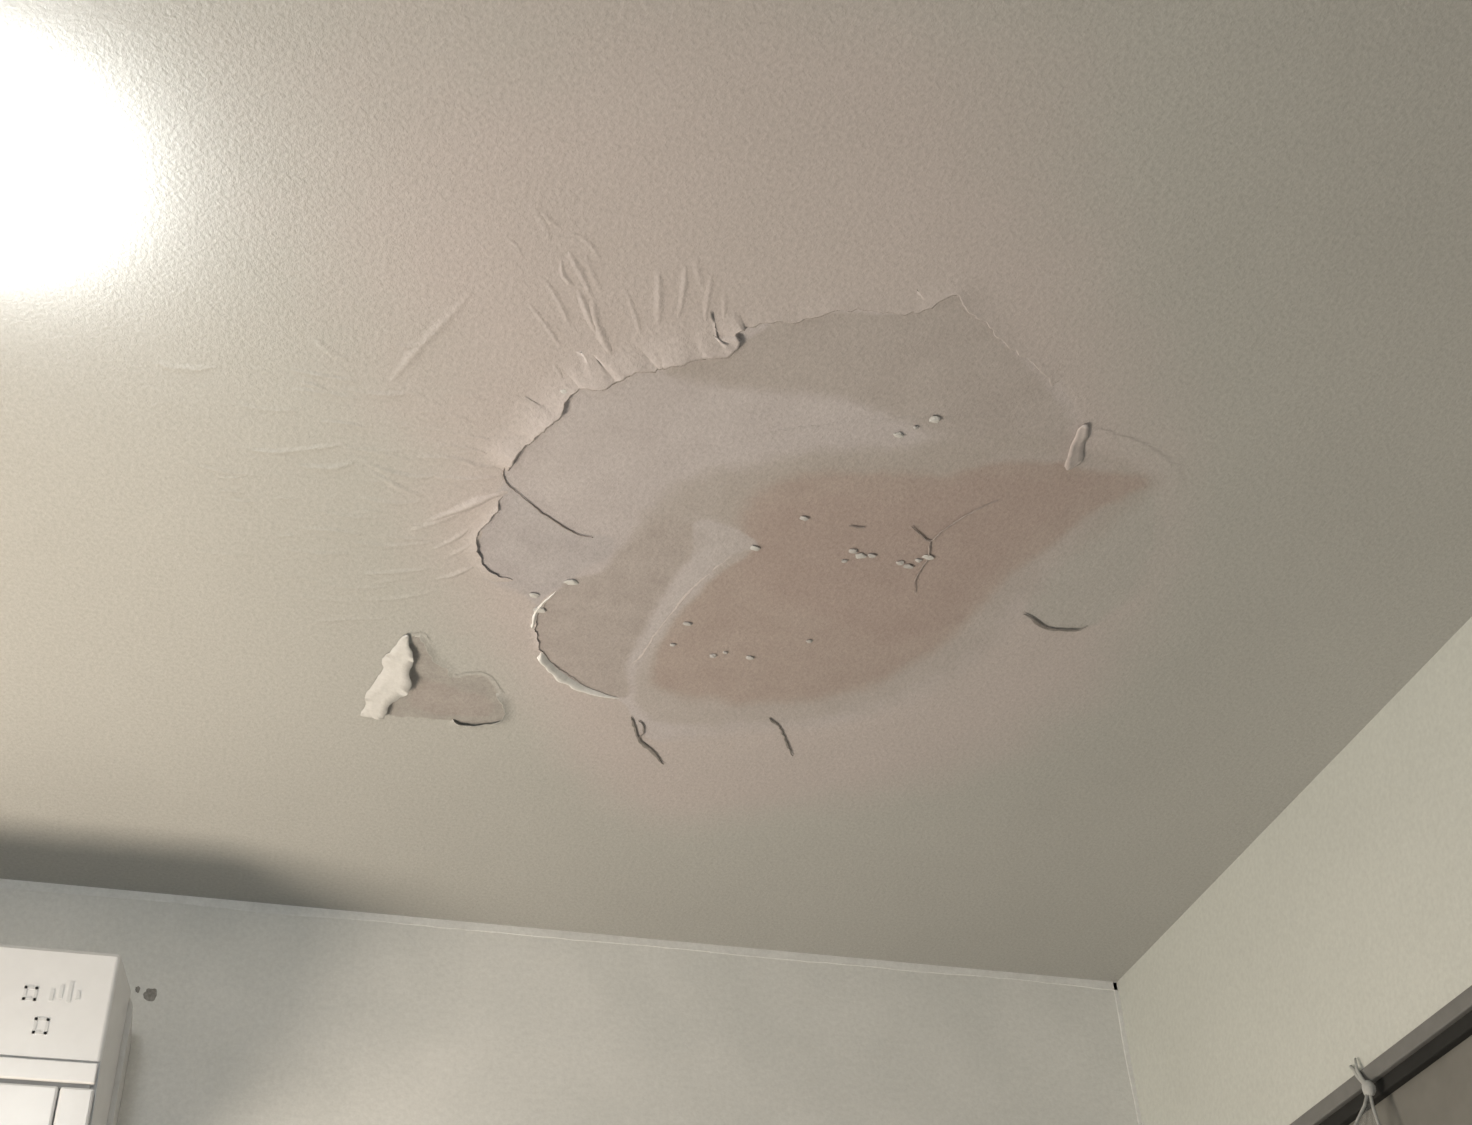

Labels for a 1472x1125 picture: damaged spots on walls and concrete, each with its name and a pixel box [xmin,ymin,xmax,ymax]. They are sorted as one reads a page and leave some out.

damp [0,0,1358,871]
peeling [455,270,1102,755]
crack [1023,614,1086,632]
peeling [360,631,518,731]
crack [631,717,664,765]